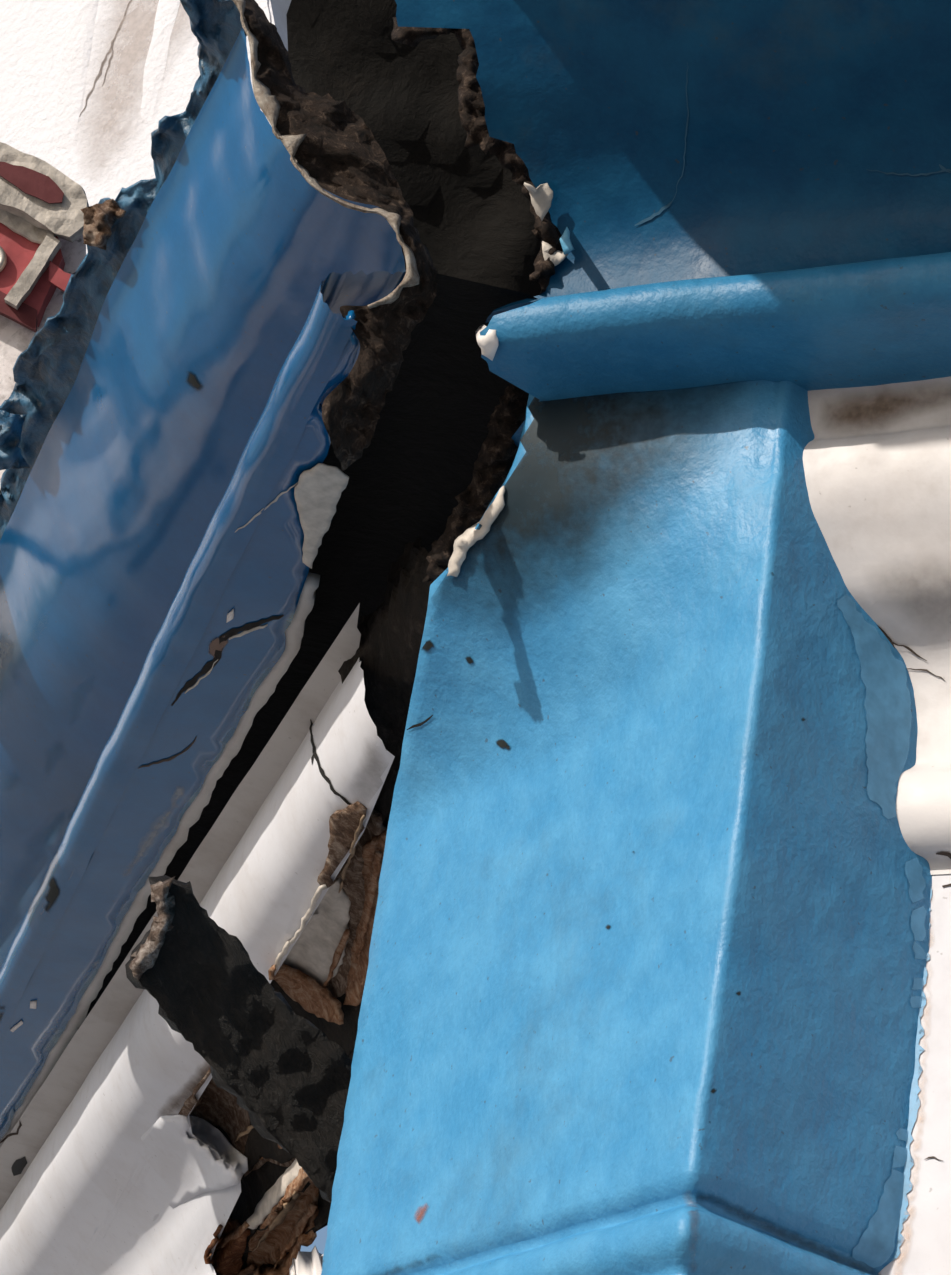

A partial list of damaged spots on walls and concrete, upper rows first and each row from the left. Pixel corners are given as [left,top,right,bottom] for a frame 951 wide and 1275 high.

spalling [164,0,574,880]
crack [171,615,284,706]
crack [138,736,197,769]
crack [309,719,351,805]
peeling [45,878,59,911]
spalling [78,894,157,1029]
peeling [0,1000,37,1032]
peeling [128,1115,248,1221]
peeling [289,1246,323,1275]